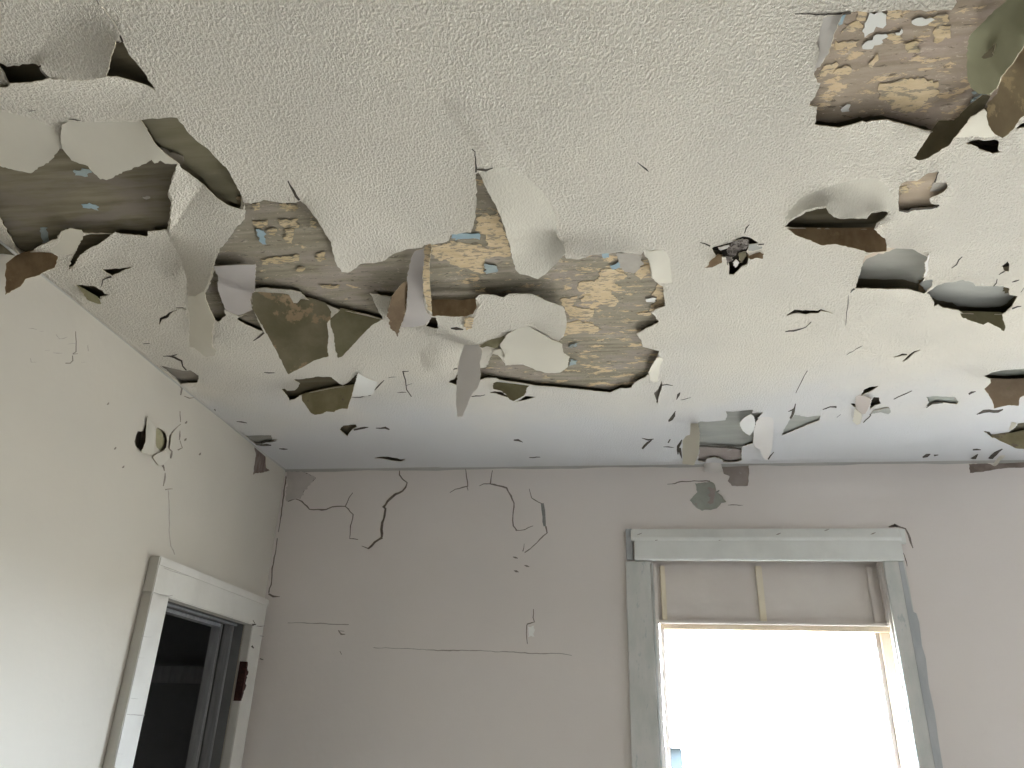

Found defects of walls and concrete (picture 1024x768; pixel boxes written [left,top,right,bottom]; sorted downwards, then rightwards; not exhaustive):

peeling [800,0,1024,161]
peeling [77,285,101,304]
peeling [0,111,184,295]
peeling [205,149,672,417]
peeling [705,243,764,268]
peeling [785,172,1021,331]
crack [160,387,194,596]
peeling [162,354,199,382]
crack [268,457,408,597]
crack [450,469,548,572]
peeling [667,410,774,511]
peeling [926,369,1024,415]